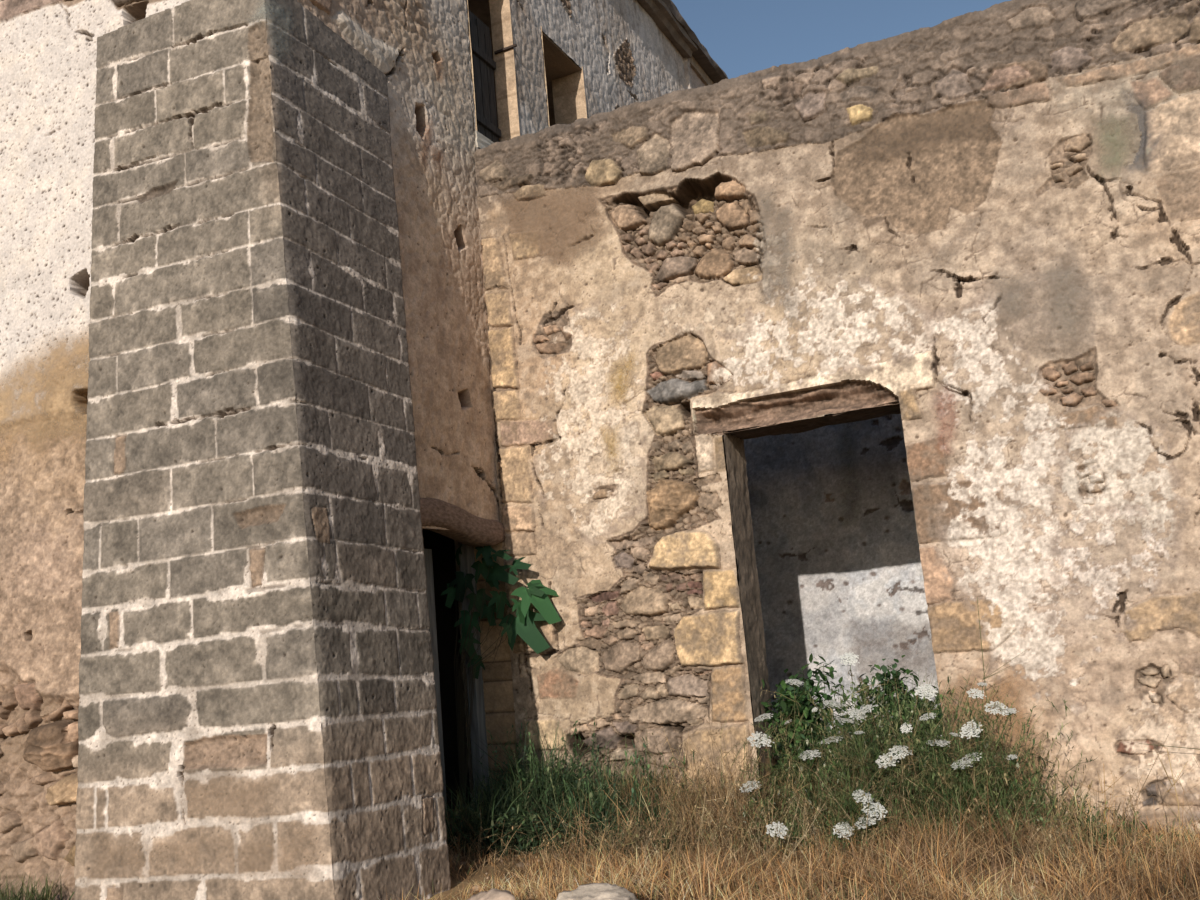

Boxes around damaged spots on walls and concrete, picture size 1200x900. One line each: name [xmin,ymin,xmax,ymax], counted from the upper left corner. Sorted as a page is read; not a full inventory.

spalling [1035,133,1095,198]
crack [929,336,974,424]
crack [930,268,1010,328]
crack [1084,162,1200,461]
spalling [530,171,1185,795]
crack [1192,497,1200,527]
flaking render [0,387,88,900]
peeling [1112,663,1200,808]